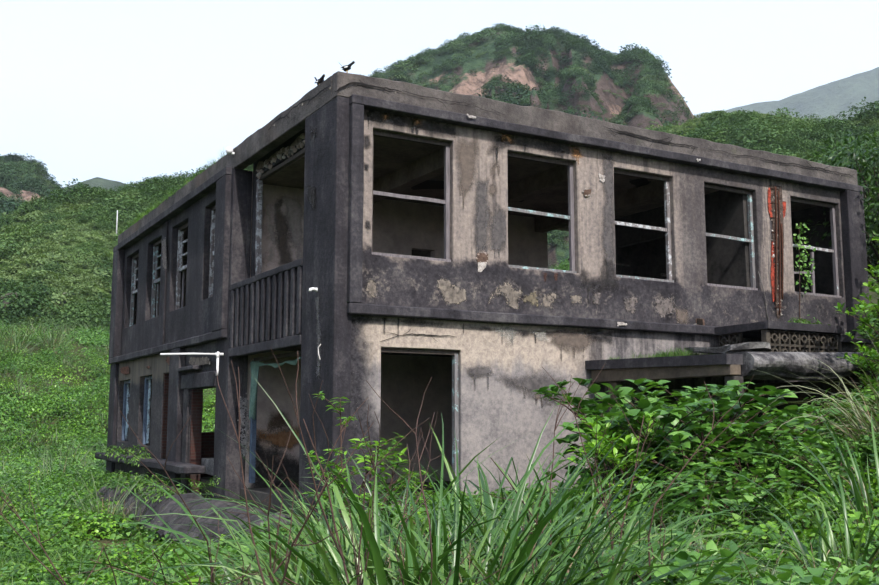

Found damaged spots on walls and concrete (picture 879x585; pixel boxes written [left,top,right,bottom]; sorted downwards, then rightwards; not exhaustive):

water stain [365,110,571,258]
spalling [476,252,488,272]
corrosion [768,185,786,318]
peeling [437,279,468,306]
peeling [489,282,601,309]
peeling [653,296,675,318]
water stain [353,315,443,333]
water stain [501,328,613,361]
water stain [468,366,492,389]